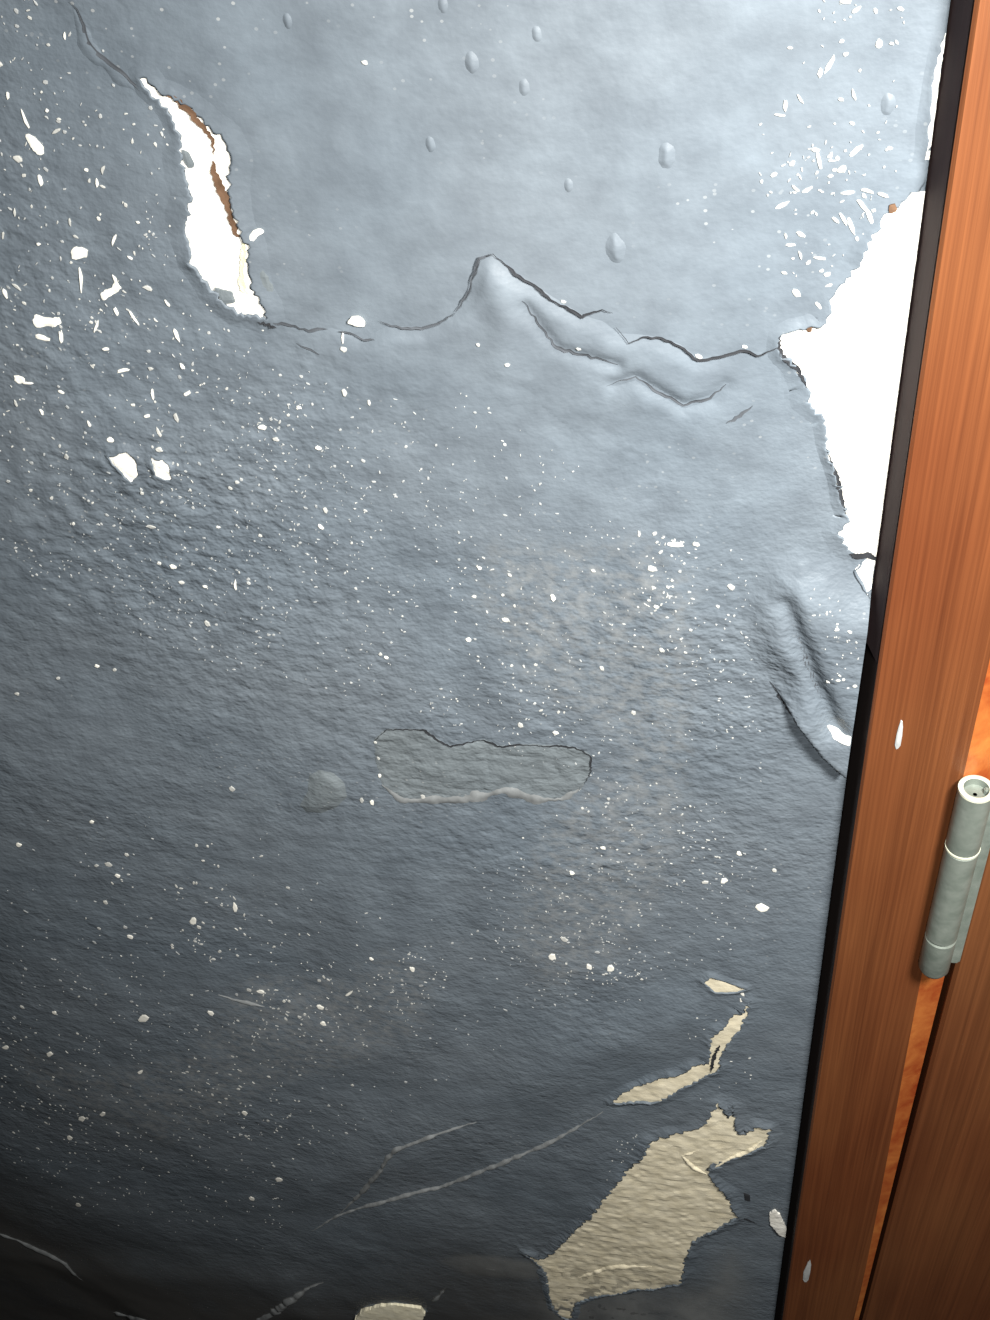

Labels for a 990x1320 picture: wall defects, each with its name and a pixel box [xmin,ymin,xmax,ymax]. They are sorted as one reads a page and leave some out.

peeling [1,0,71,47]
crack [69,2,137,91]
peeling [818,0,905,24]
spalling [0,55,425,696]
crack [273,254,777,424]
spalling [759,30,946,598]
peeling [810,588,859,689]
spalling [374,467,786,1320]
peeling [0,918,170,1207]
peeling [163,881,447,1168]
spalling [352,1300,429,1320]